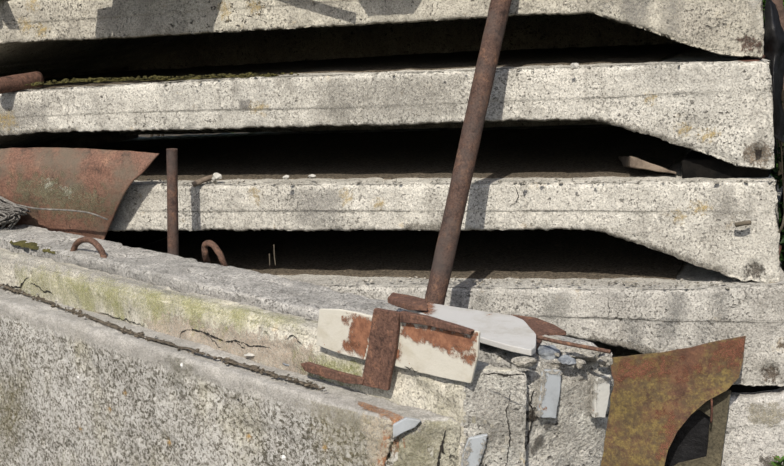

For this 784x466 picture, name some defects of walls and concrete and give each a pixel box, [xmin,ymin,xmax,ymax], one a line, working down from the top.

crack [2,277,53,295]
crack [180,328,300,348]
corrosion [358,401,405,466]
crack [481,372,536,466]